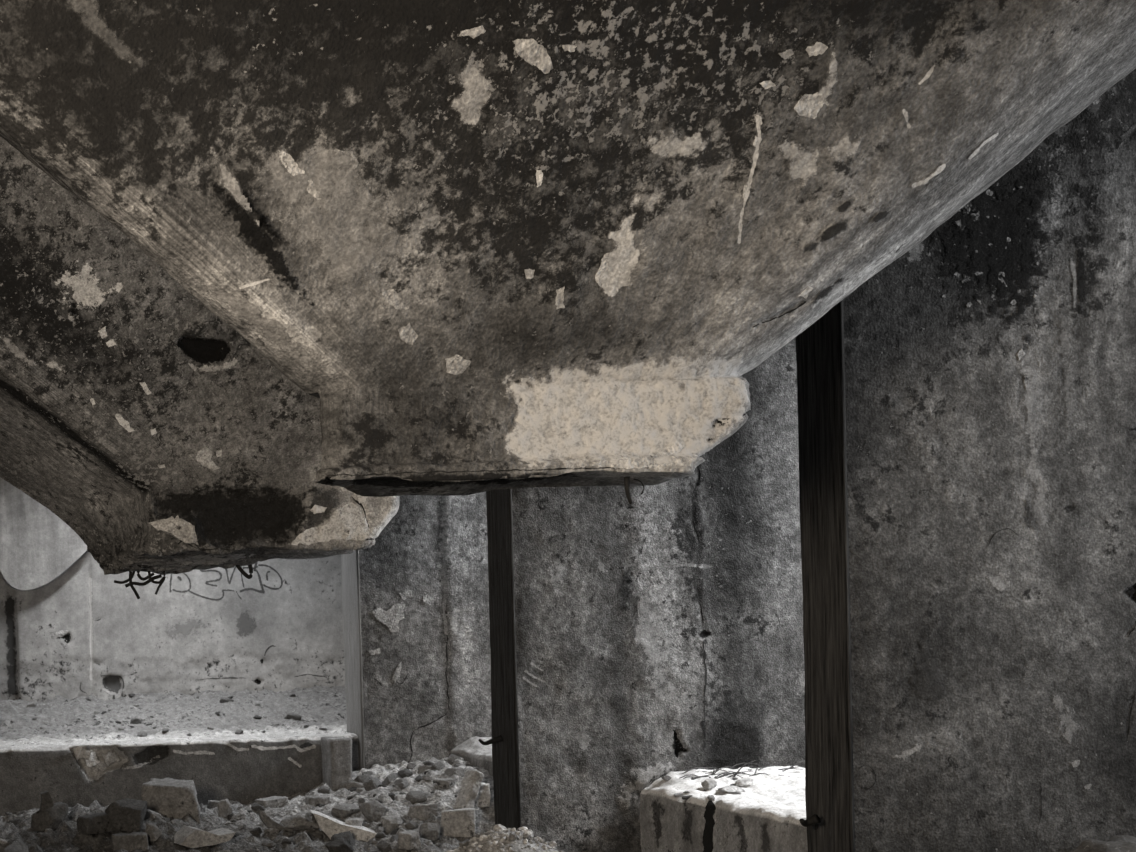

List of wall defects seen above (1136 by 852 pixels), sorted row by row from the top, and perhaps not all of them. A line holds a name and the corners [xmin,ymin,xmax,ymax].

peeling [452,64,491,125]
peeling [514,38,553,74]
peeling [778,42,838,119]
crack [1116,123,1136,149]
spalling [595,195,641,297]
water stain [907,166,1051,328]
water stain [1056,228,1096,421]
peeling [503,357,749,504]
water stain [1016,341,1050,531]
crack [691,466,712,748]
crack [1125,586,1136,637]
crack [1122,693,1135,738]